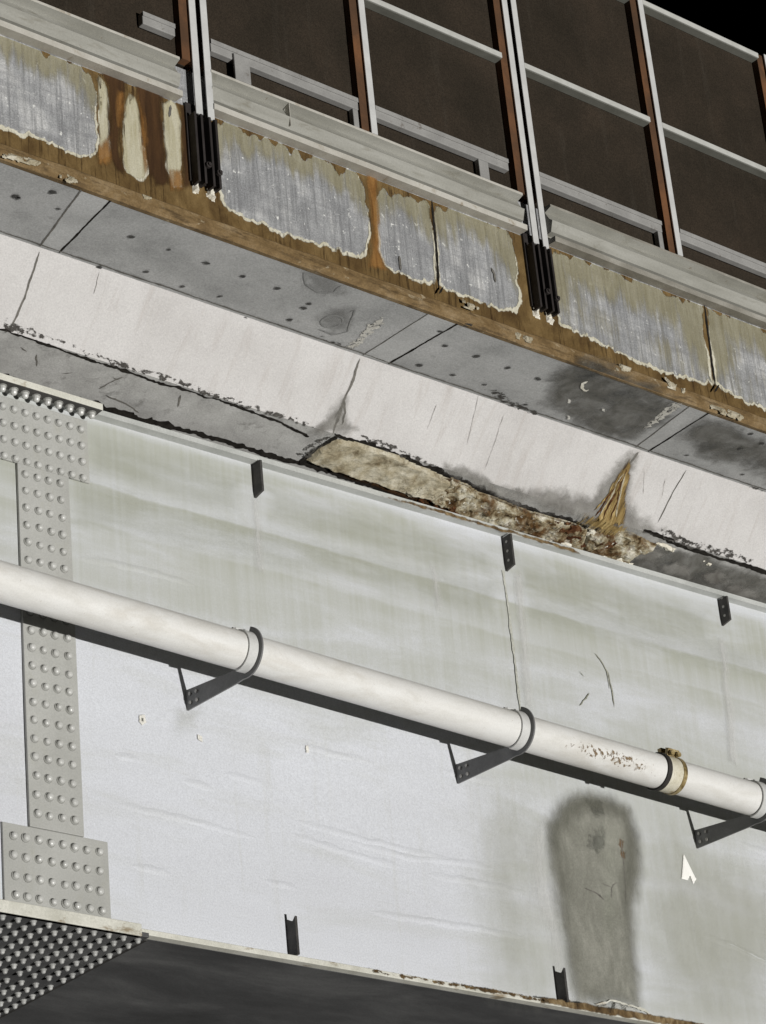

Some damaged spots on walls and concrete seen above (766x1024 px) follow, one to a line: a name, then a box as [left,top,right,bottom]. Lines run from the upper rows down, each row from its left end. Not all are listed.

spalling [2,153,41,166]
corrosion [0,36,766,418]
crack [0,252,588,528]
spalling [4,323,752,566]
crack [630,452,766,575]
crack [581,656,615,706]
corrosion [571,745,646,770]
damp [541,795,639,1005]